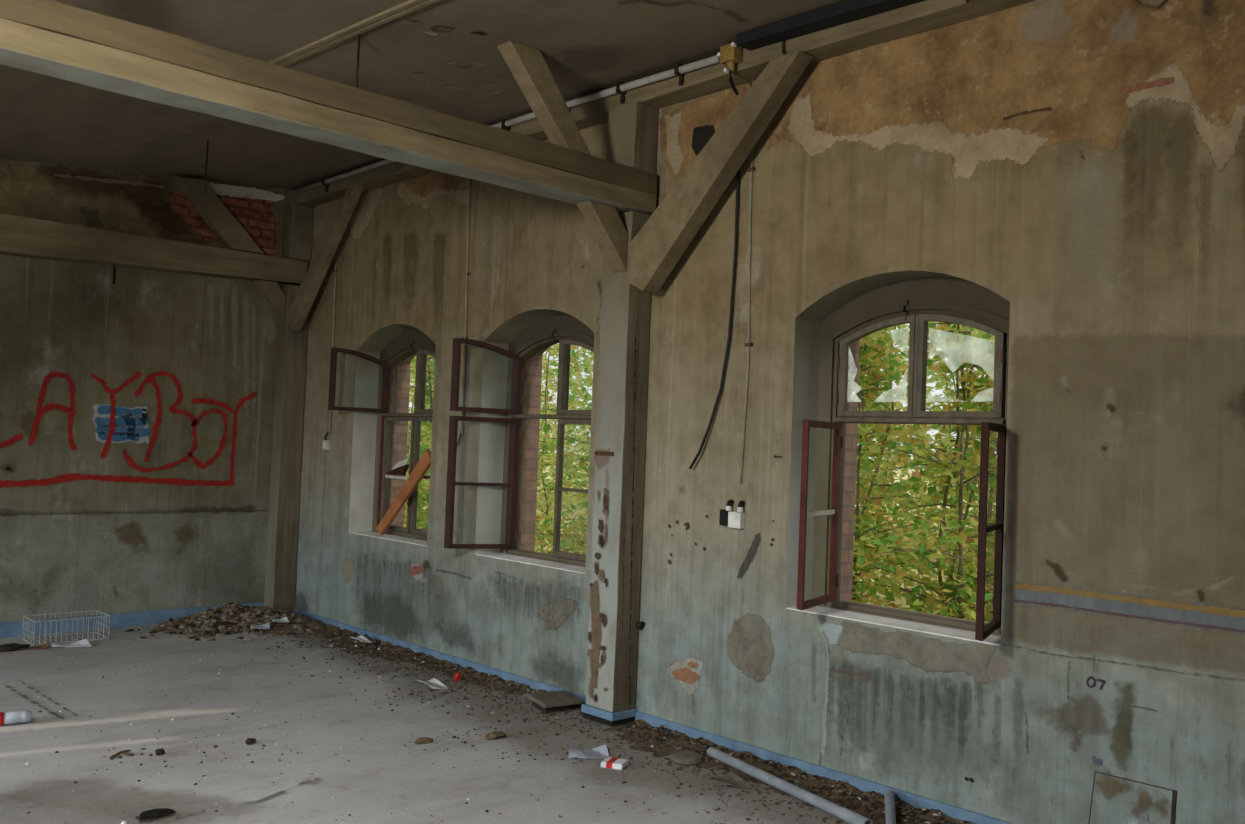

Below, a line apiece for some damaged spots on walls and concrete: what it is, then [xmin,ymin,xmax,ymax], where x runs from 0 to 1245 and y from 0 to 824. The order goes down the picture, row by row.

crack [619,0,743,22]
flaking render [659,83,753,181]
flaking render [764,0,1245,180]
flaking render [0,163,226,249]
flaking render [203,179,279,257]
peeling [586,488,609,702]
flaking render [666,657,703,696]
water stain [1059,684,1132,765]